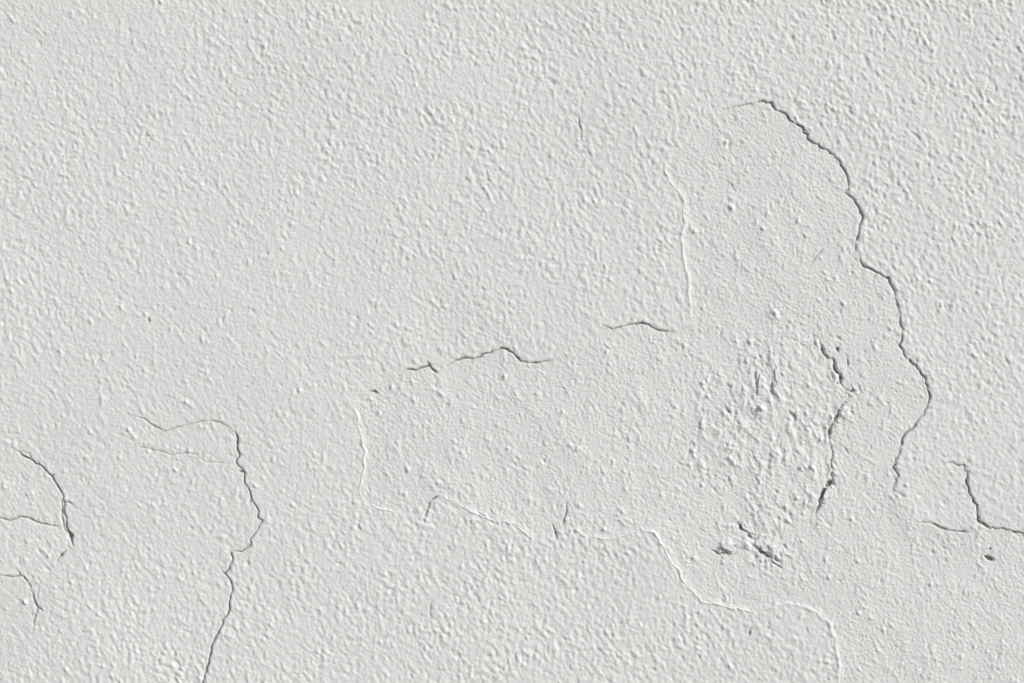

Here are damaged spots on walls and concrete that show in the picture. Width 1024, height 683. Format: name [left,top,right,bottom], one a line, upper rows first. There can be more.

crack [405,347,552,373]
crack [603,322,671,332]
crack [734,100,931,511]
crack [0,450,73,561]
crack [921,462,1024,535]
crack [132,415,263,683]
crack [0,570,43,631]